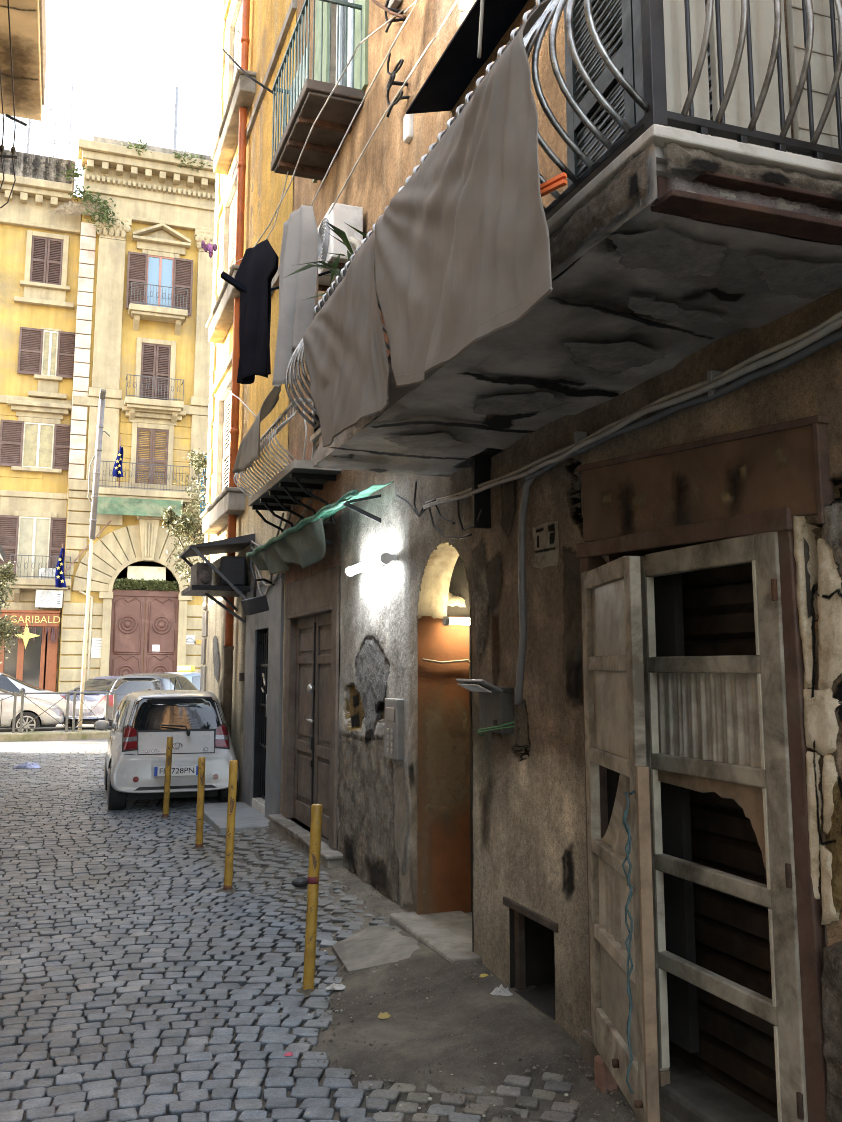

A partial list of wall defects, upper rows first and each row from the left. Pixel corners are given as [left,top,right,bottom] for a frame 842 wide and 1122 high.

peeling [549,142,842,325]
peeling [474,392,568,415]
peeling [562,341,665,374]
peeling [337,634,418,908]
peeling [793,478,842,925]